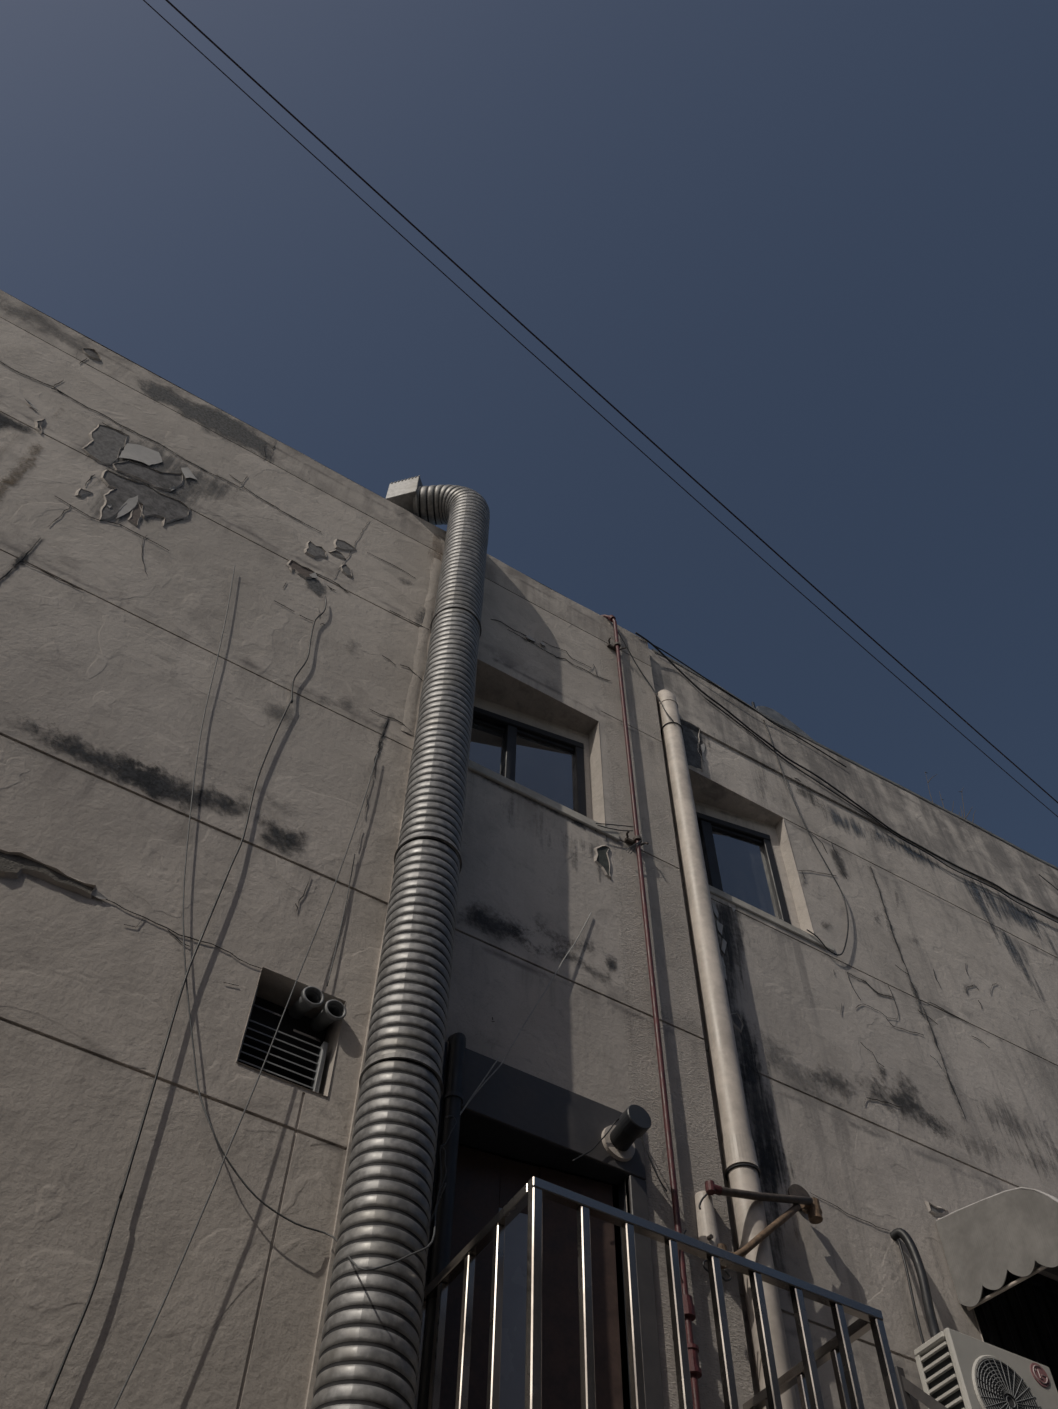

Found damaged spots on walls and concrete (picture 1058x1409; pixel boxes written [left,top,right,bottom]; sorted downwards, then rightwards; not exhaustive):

damp [141,381,272,459]
peeling [75,423,227,527]
peeling [286,522,368,596]
damp [33,725,245,813]
spalling [0,849,107,899]
damp [261,821,304,852]
damp [467,905,523,941]
damp [965,880,1039,987]
crack [798,832,993,1119]
damp [871,1068,941,1132]